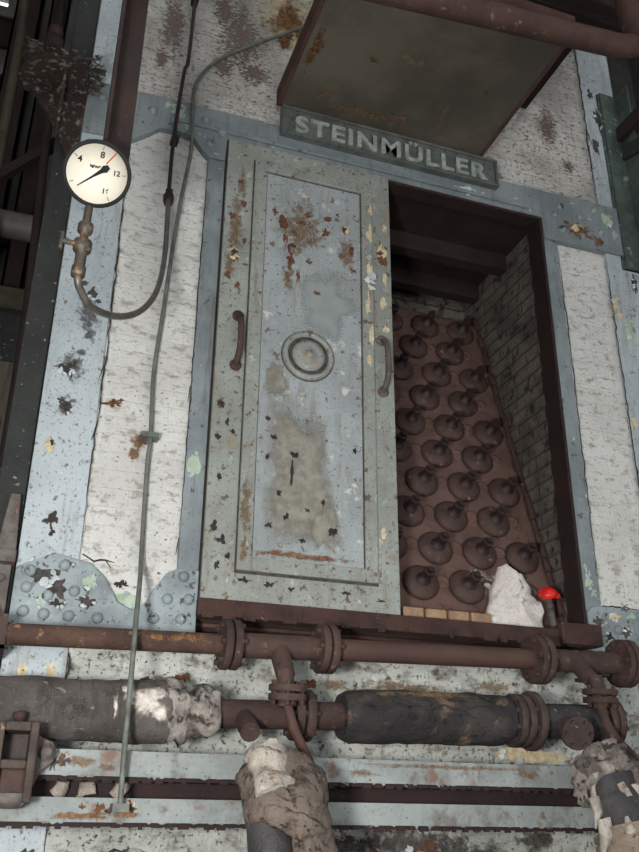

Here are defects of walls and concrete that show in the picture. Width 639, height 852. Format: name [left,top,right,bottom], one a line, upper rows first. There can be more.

corrosion [267,1,302,49]
corrosion [224,175,247,289]
corrosion [272,205,339,288]
corrosion [338,225,356,274]
peeling [364,203,388,316]
corrosion [563,220,604,246]
peeling [304,276,356,338]
peeling [367,325,390,366]
peeling [266,362,287,396]
peeling [267,413,338,551]